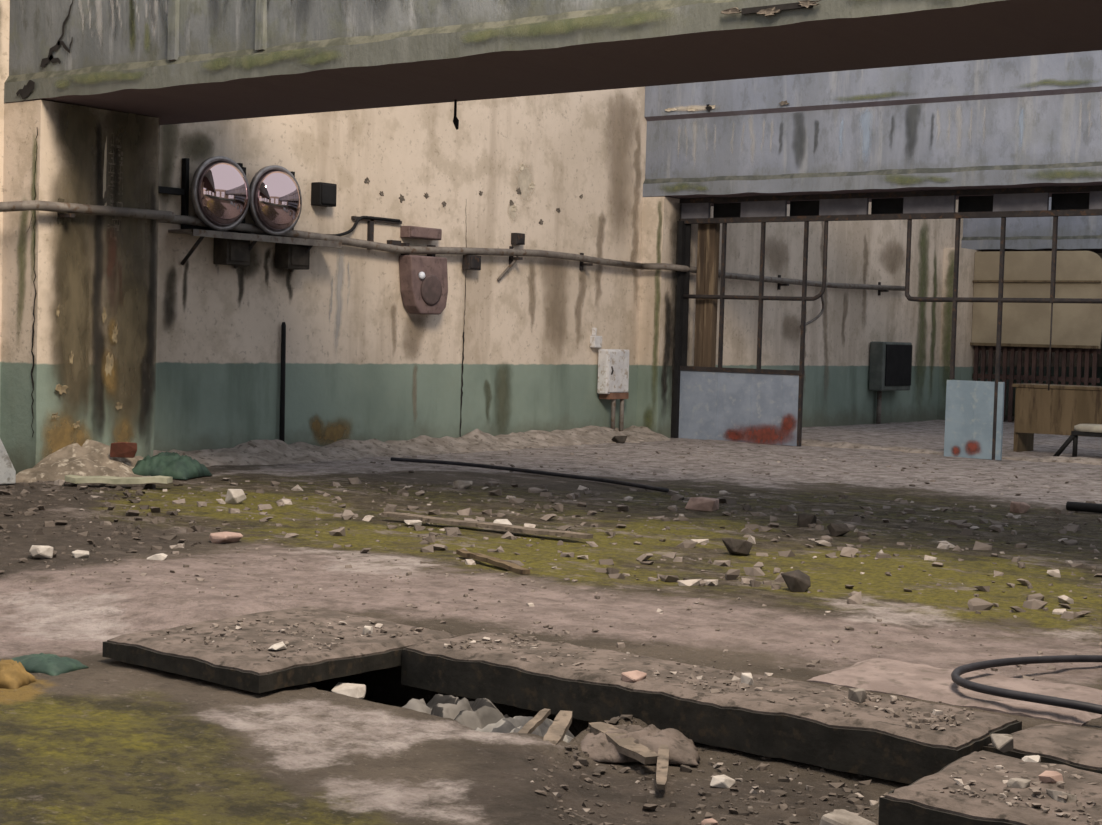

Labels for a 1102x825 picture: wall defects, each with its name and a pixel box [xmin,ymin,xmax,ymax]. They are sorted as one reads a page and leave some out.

crack [16,0,73,99]
damp [79,0,164,48]
damp [613,106,640,262]
damp [54,102,211,431]
damp [576,271,584,324]
damp [662,296,671,403]